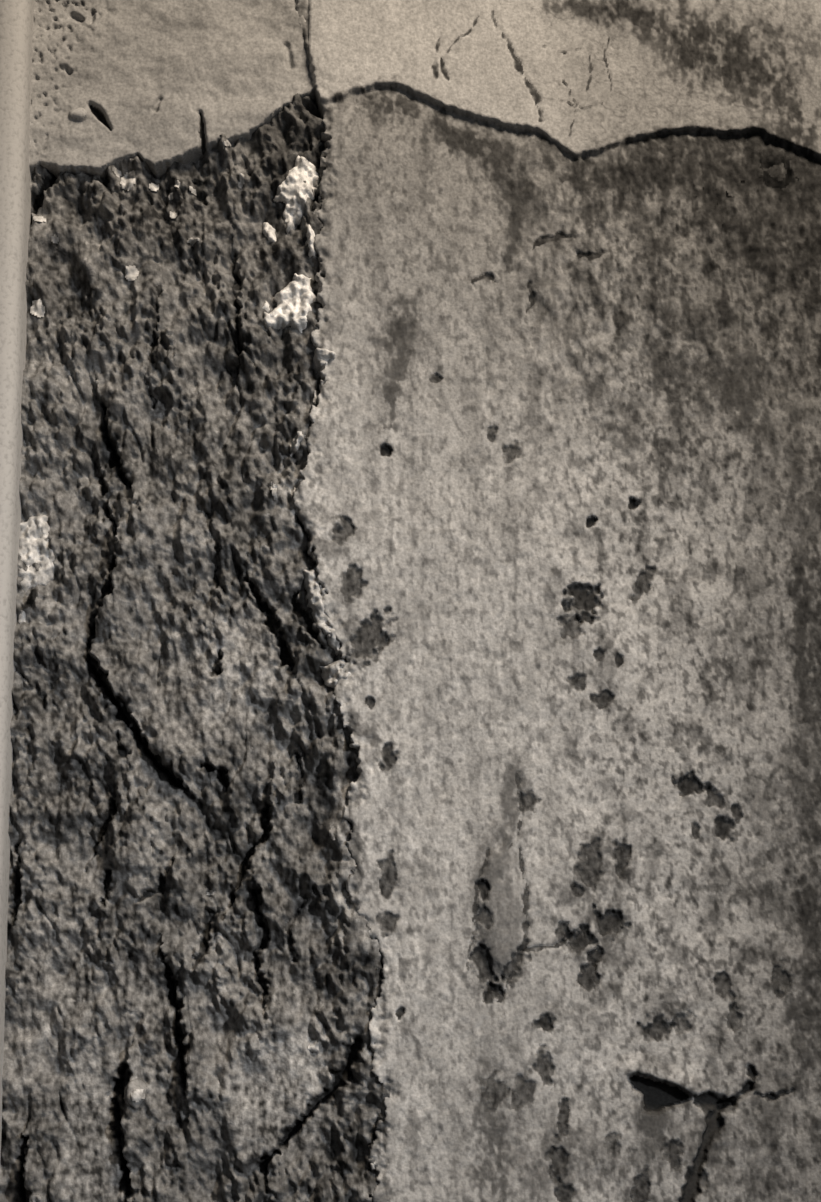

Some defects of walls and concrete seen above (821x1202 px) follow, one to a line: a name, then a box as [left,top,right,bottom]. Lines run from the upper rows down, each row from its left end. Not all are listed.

crack [432,10,612,135]
water stain [361,87,535,271]
water stain [553,0,821,291]
water stain [378,296,416,429]
water stain [655,335,758,415]
spalling [487,427,520,463]
spalling [0,93,399,1202]
spalling [480,1013,555,1111]
spalling [637,1011,692,1041]
spalling [714,972,743,1032]
spalling [546,1098,575,1202]
spalling [630,1075,688,1170]